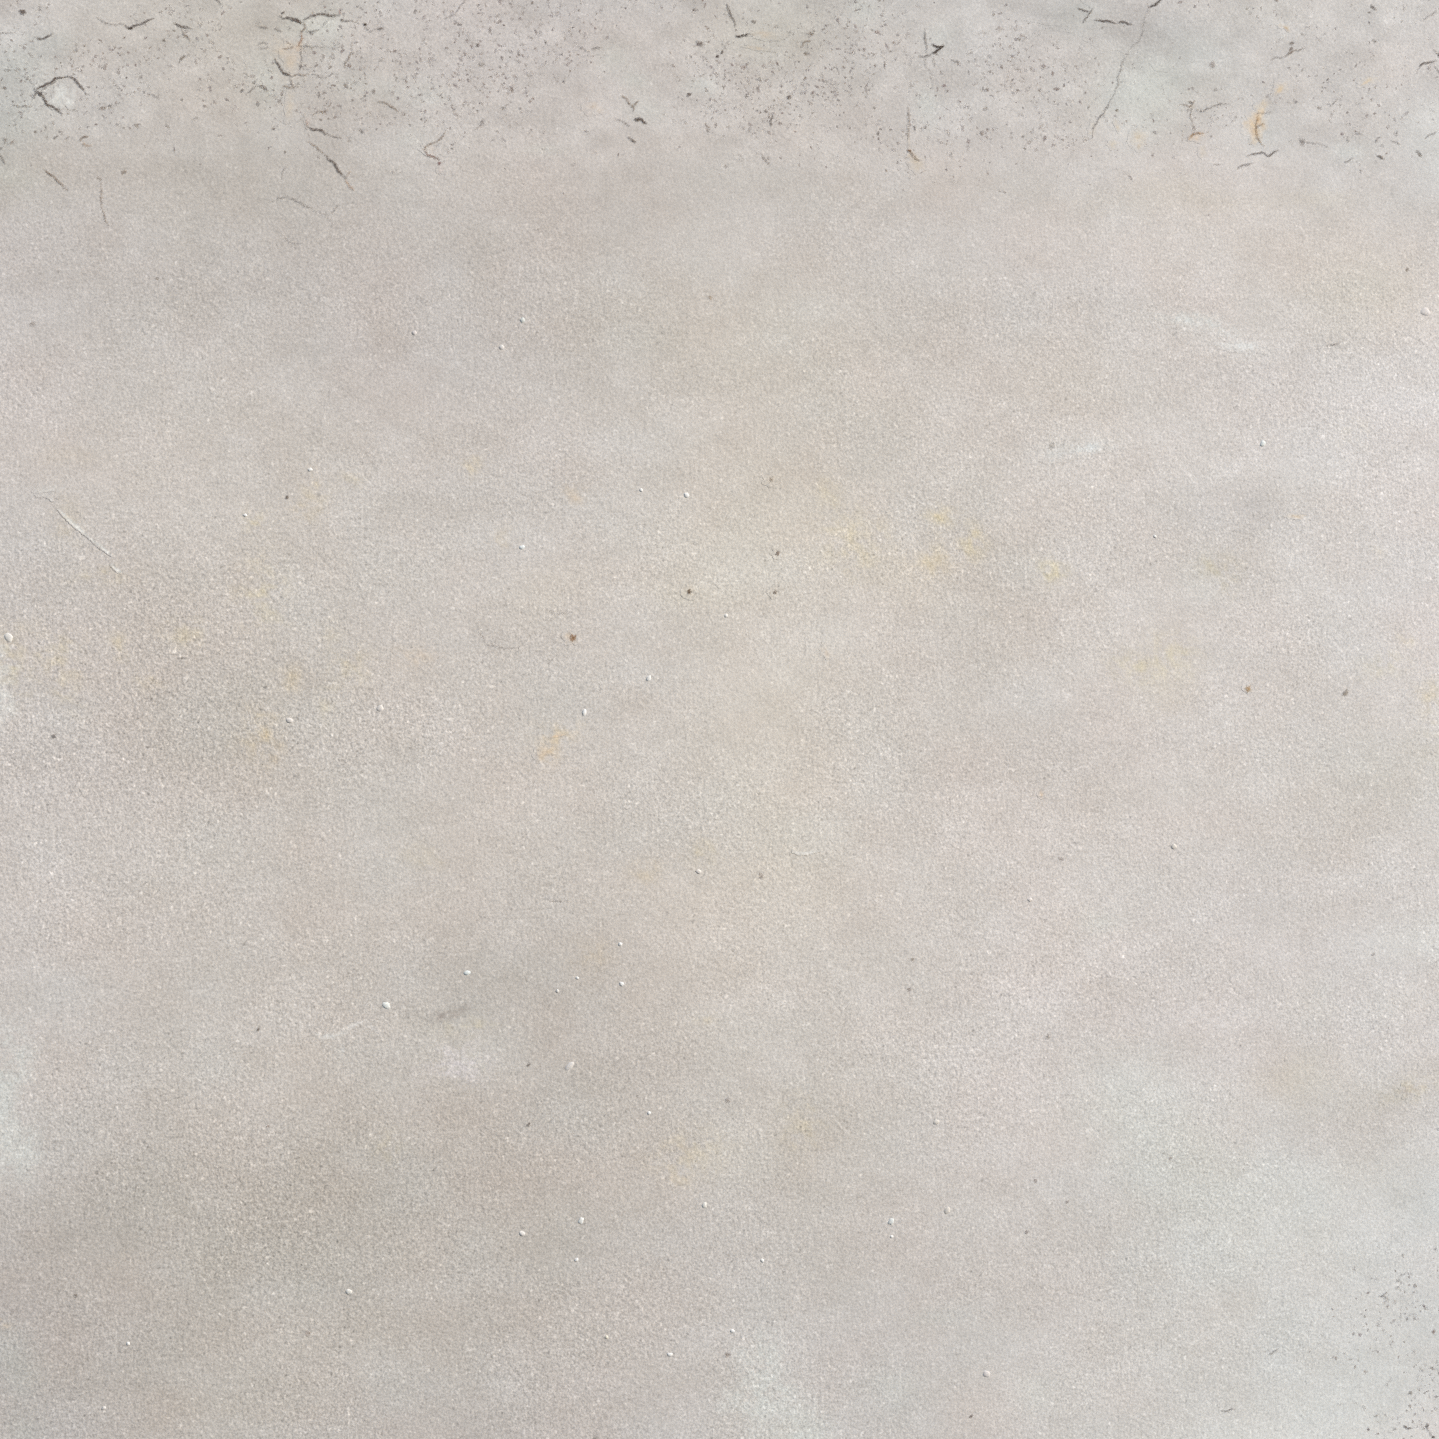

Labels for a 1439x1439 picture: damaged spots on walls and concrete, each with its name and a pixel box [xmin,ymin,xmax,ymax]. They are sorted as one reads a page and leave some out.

crack [98,0,191,42]
crack [240,11,383,227]
crack [418,130,448,175]
crack [1078,0,1161,138]